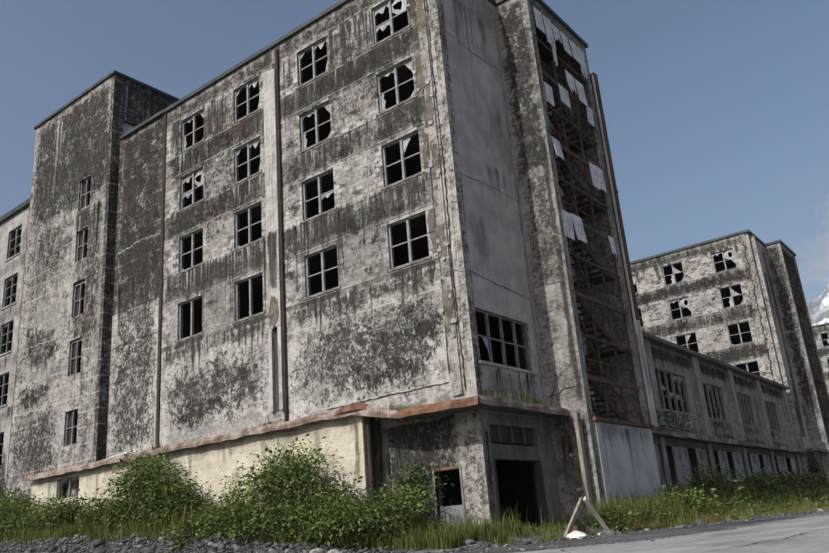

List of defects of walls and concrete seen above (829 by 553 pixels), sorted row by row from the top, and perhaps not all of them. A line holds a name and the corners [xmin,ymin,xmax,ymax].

leakage [24,81,111,463]
leakage [116,0,437,328]
leakage [294,342,330,411]
crack [741,242,775,381]